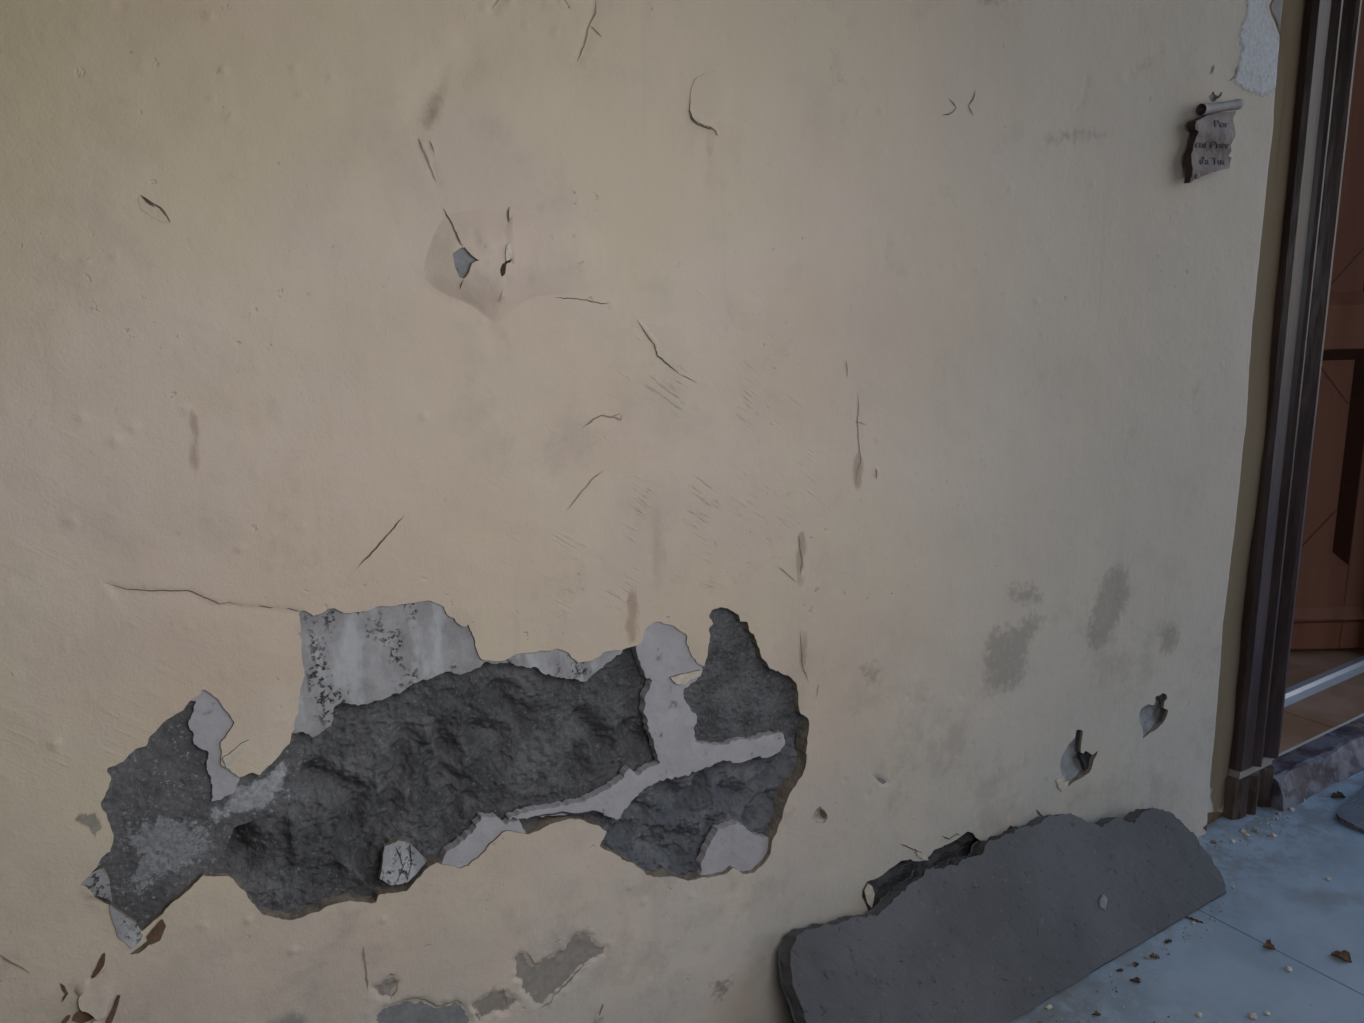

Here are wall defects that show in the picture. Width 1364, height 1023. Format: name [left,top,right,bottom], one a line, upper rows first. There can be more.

flaking render [1270,0,1283,36]
crack [105,582,298,611]
flaking render [1139,693,1165,737]
flaking render [77,600,803,954]
flaking render [1055,730,1091,791]
flaking render [862,832,980,911]
peeling [60,953,120,1023]
peeling [375,933,604,1023]